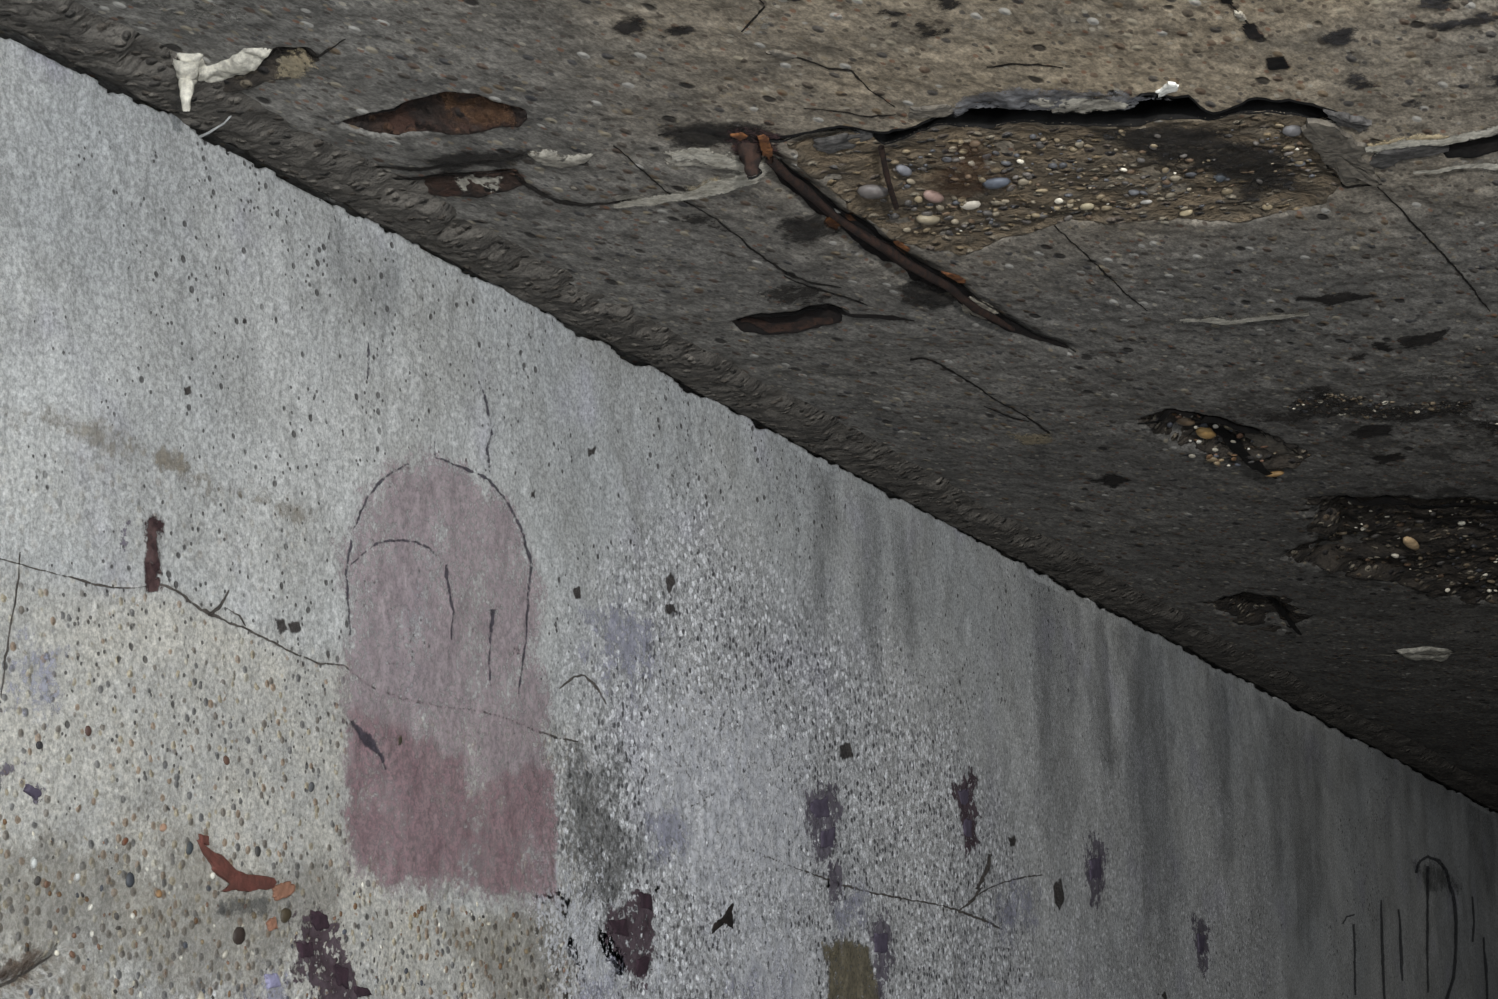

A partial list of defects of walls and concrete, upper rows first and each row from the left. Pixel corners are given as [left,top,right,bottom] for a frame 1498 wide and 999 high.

spalling [342,92,528,135]
rust [720,126,781,160]
crack [375,0,1372,311]
spalling [732,113,1381,353]
crack [1326,165,1490,312]
spalling [1137,329,1498,479]
crack [0,552,578,742]
spalling [1202,592,1312,635]
spalling [1282,495,1498,604]